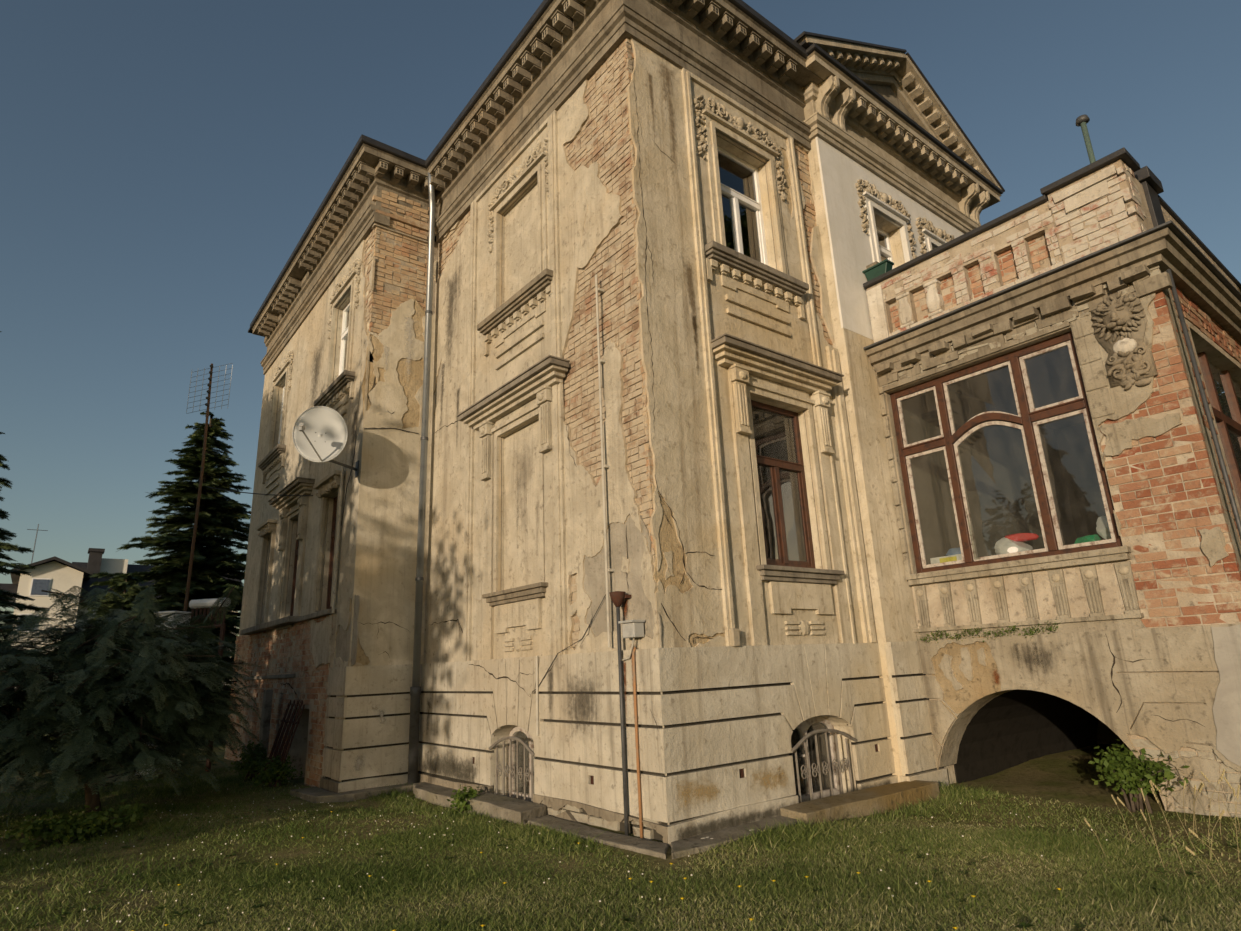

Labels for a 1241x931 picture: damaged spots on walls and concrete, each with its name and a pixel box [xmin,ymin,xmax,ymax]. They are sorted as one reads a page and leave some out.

spalling [361,190,470,429]
spalling [557,38,692,648]
spalling [882,298,1090,388]
spalling [1103,282,1137,298]
spalling [1099,290,1241,627]
crack [655,477,722,643]
leakage [571,687,593,727]
spalling [932,636,1001,718]
leakage [425,757,476,783]
spalling [1130,739,1241,818]